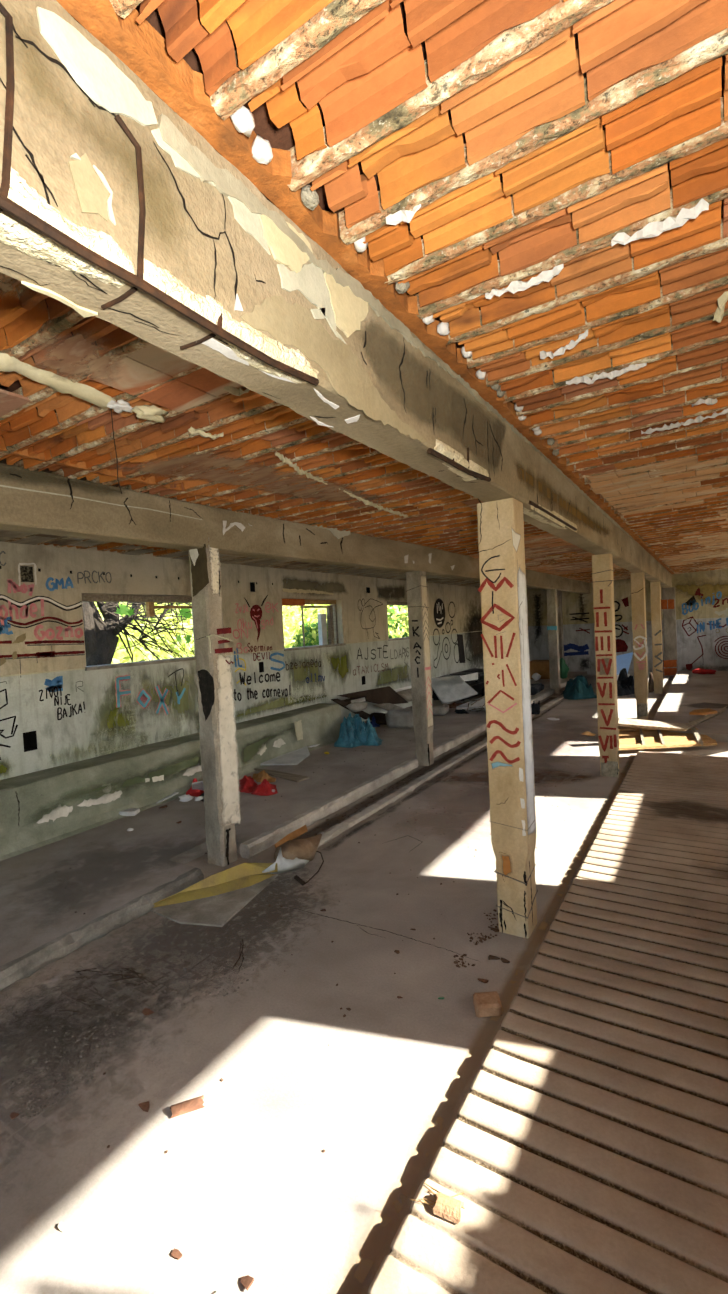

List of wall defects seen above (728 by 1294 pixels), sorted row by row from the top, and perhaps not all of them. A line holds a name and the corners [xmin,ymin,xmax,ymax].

crack [13,25,116,117]
crack [13,126,58,207]
crack [153,141,266,302]
crack [1,261,180,336]
spalling [0,2,633,540]
water stain [363,328,505,467]
flaking render [566,363,647,385]
peeling [512,529,520,551]